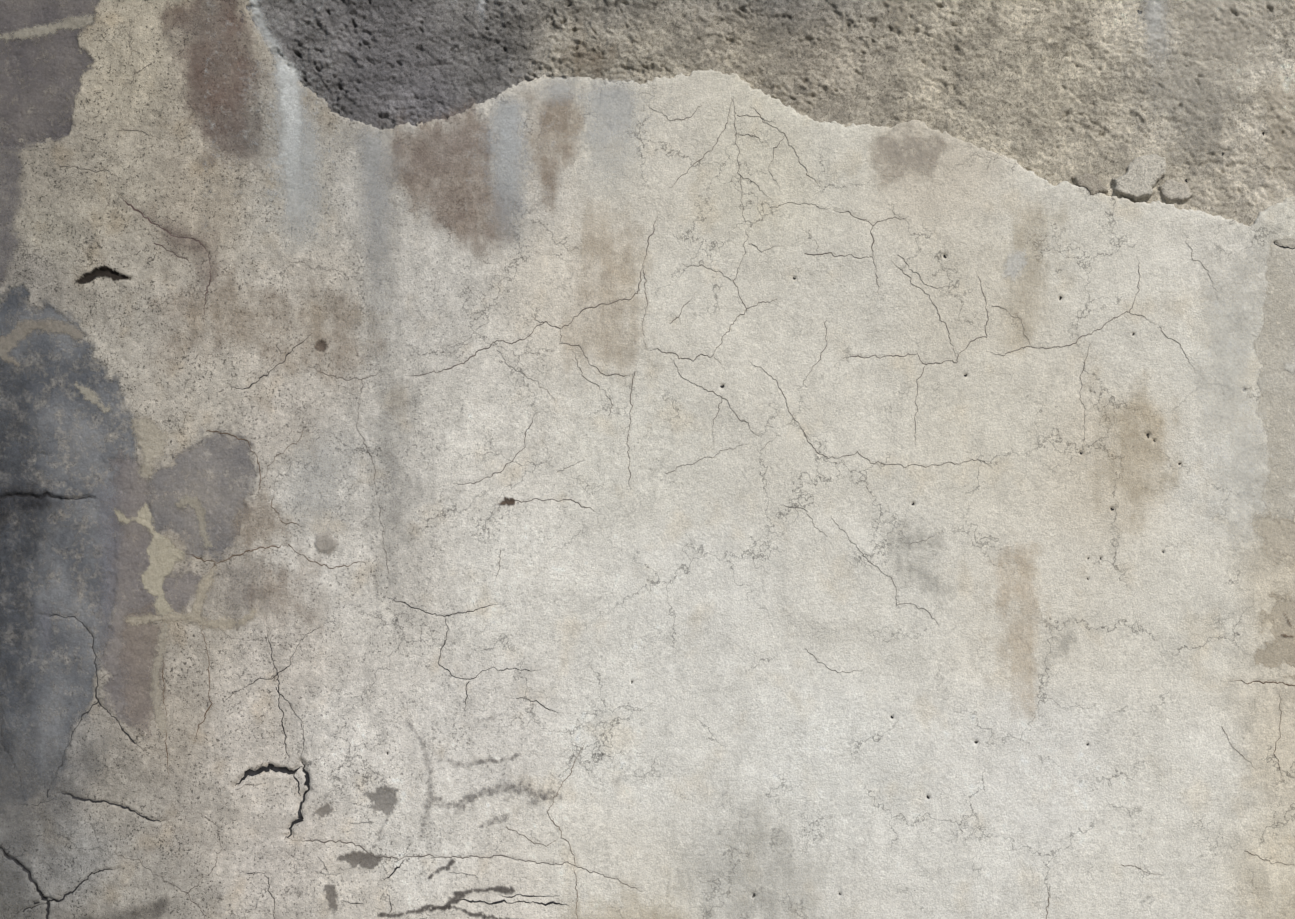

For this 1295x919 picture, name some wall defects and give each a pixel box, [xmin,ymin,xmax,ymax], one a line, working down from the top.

peeling [0,0,99,149]
water stain [250,0,307,201]
spalling [237,0,1295,226]
crack [59,165,211,322]
crack [0,492,93,501]
water stain [0,146,202,804]
crack [189,101,1195,712]
crack [1,614,320,822]
crack [1221,680,1295,777]
crack [0,812,223,919]
crack [301,744,640,919]